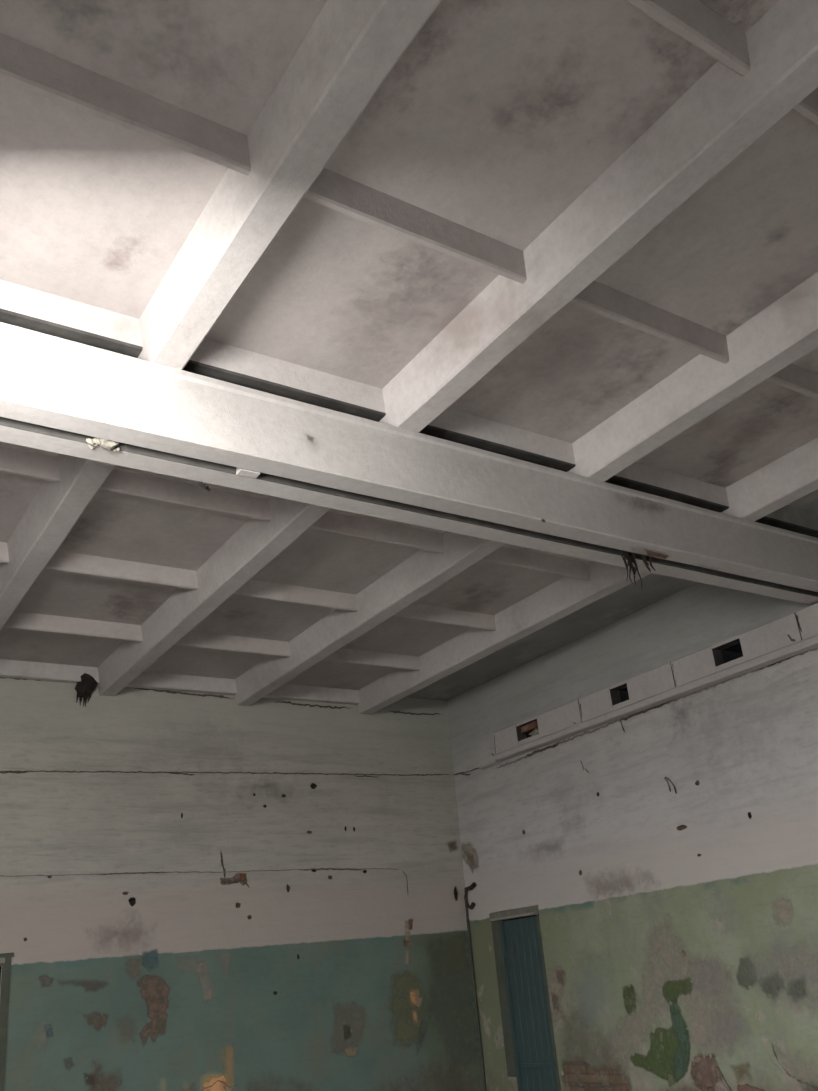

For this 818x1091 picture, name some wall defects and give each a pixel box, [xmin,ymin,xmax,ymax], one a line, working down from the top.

crack [0,614,818,778]
crack [0,868,408,893]
peeling [128,950,170,1045]
spalling [561,1057,630,1091]
peeling [623,984,635,1013]
peeling [630,979,765,1091]